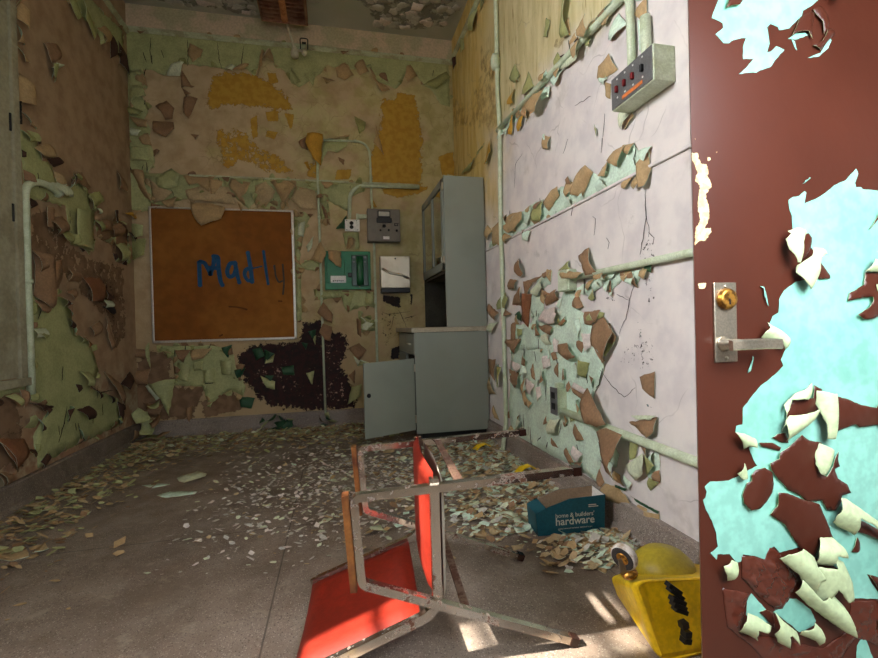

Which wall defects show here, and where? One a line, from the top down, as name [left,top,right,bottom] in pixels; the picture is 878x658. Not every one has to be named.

peeling [635,0,647,51]
peeling [712,0,835,74]
peeling [438,0,626,176]
peeling [618,112,634,129]
peeling [0,0,484,486]
peeling [484,143,652,249]
peeling [691,152,717,245]
peeling [486,248,661,520]
peeling [703,169,878,658]
peeling [449,480,549,522]
peeling [484,510,528,535]
peeling [550,527,636,569]